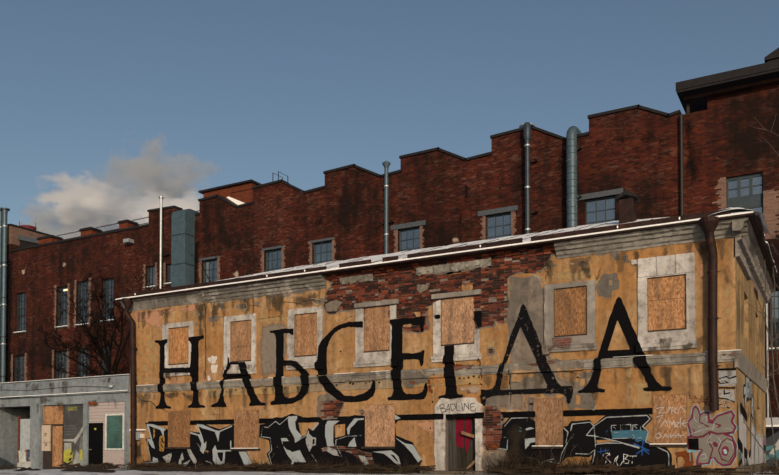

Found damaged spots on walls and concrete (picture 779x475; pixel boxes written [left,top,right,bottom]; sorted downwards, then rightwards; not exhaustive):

peeling [132,303,224,328]
peeling [207,356,218,381]
peeling [226,324,287,392]
spalling [311,252,620,470]